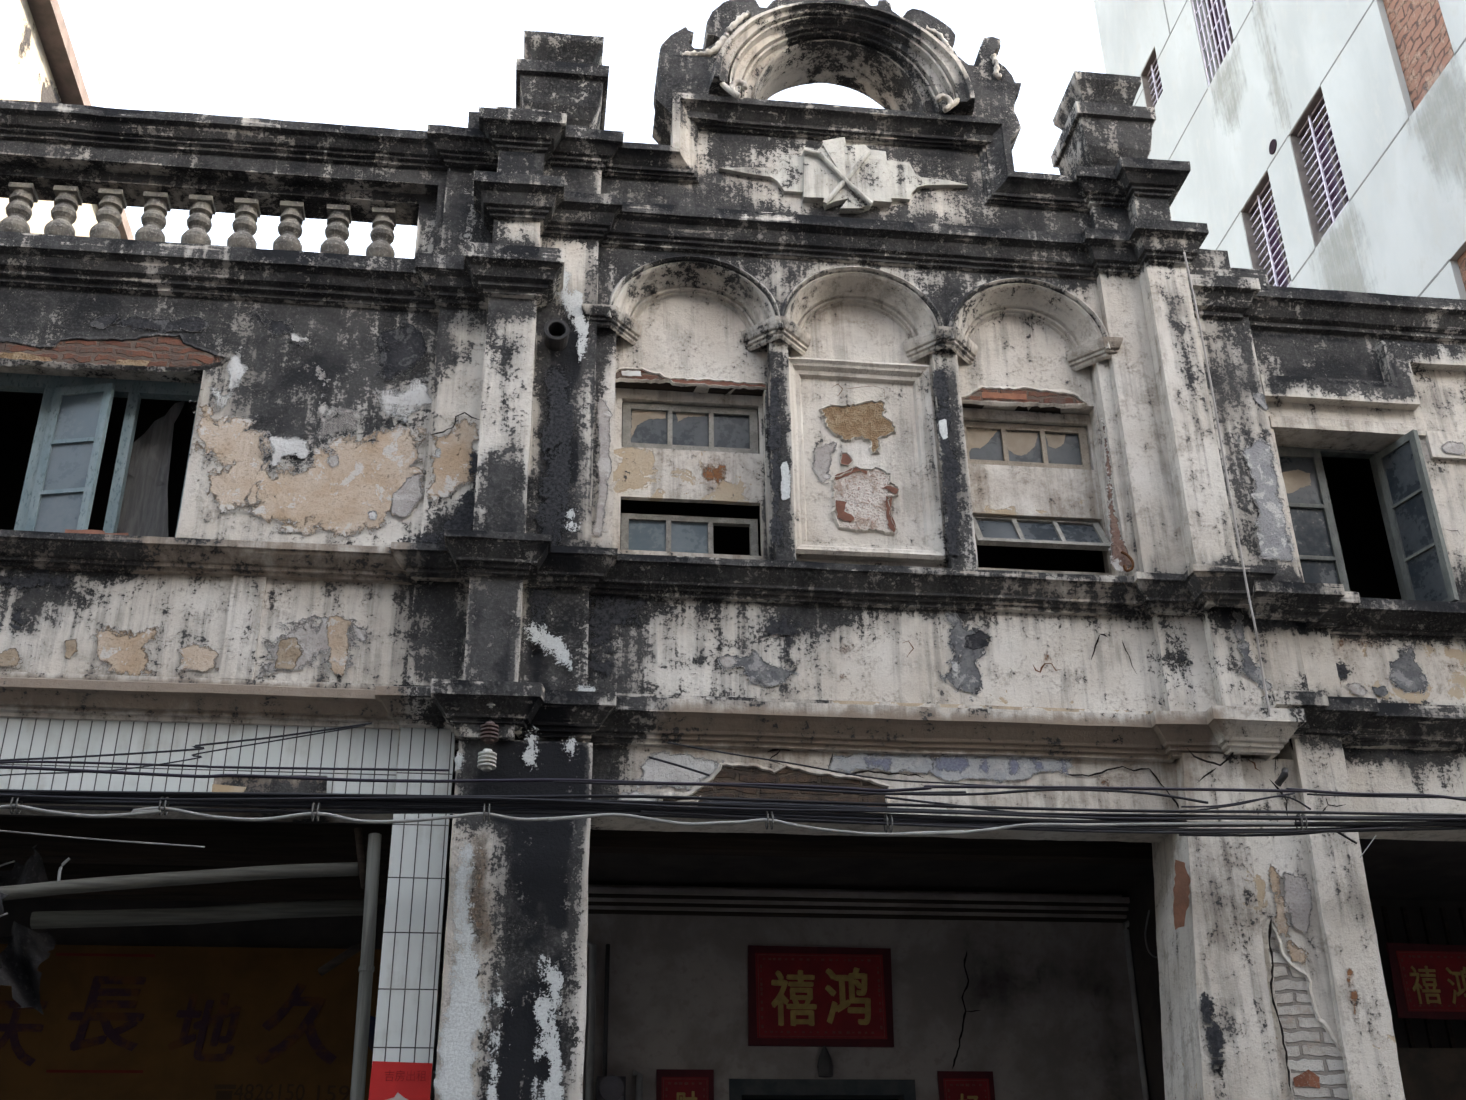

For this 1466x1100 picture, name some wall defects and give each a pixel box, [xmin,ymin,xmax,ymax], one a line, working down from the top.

peeling [0,307,479,541]
water stain [534,365,578,546]
spalling [812,400,900,535]
peeling [254,613,369,680]
water stain [526,587,557,646]
peeling [940,610,992,702]
spalling [619,751,1073,813]
crack [1069,738,1346,816]
water stain [469,834,493,948]
spalling [1173,860,1191,930]
crack [952,952,980,1069]
spalling [1262,863,1349,1100]